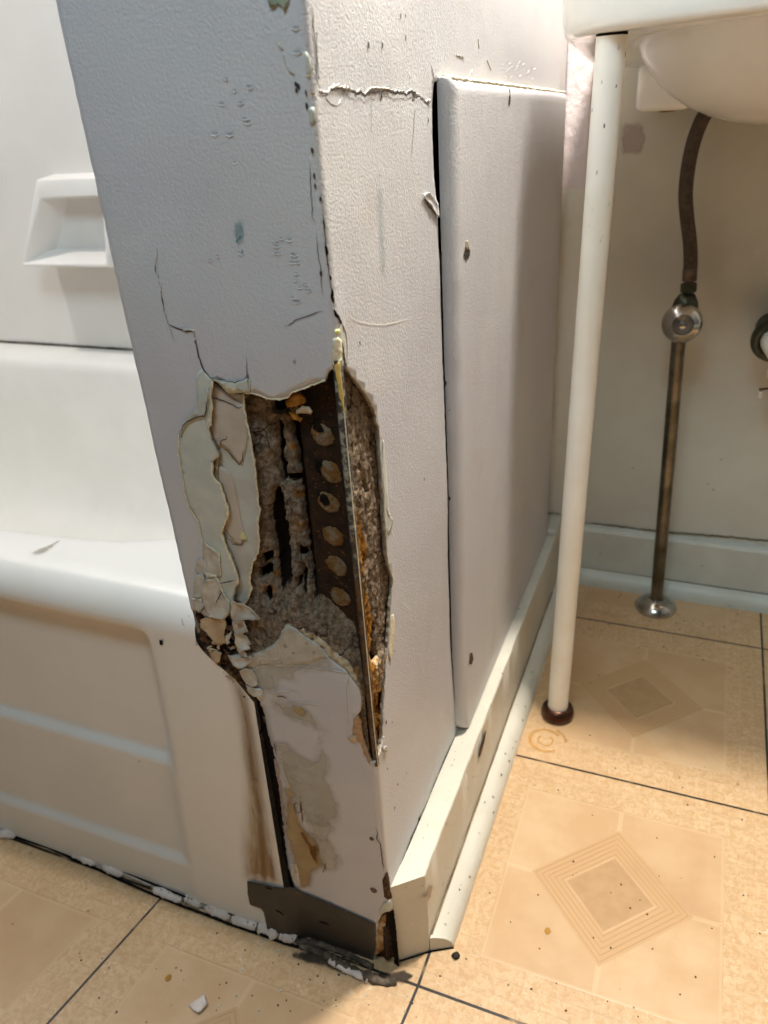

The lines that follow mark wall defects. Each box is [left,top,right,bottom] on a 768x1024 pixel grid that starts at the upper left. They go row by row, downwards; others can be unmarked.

crack [311,1,434,157]
crack [155,253,211,378]
spalling [177,325,395,767]
water stain [285,789,326,887]
spalling [379,872,393,916]